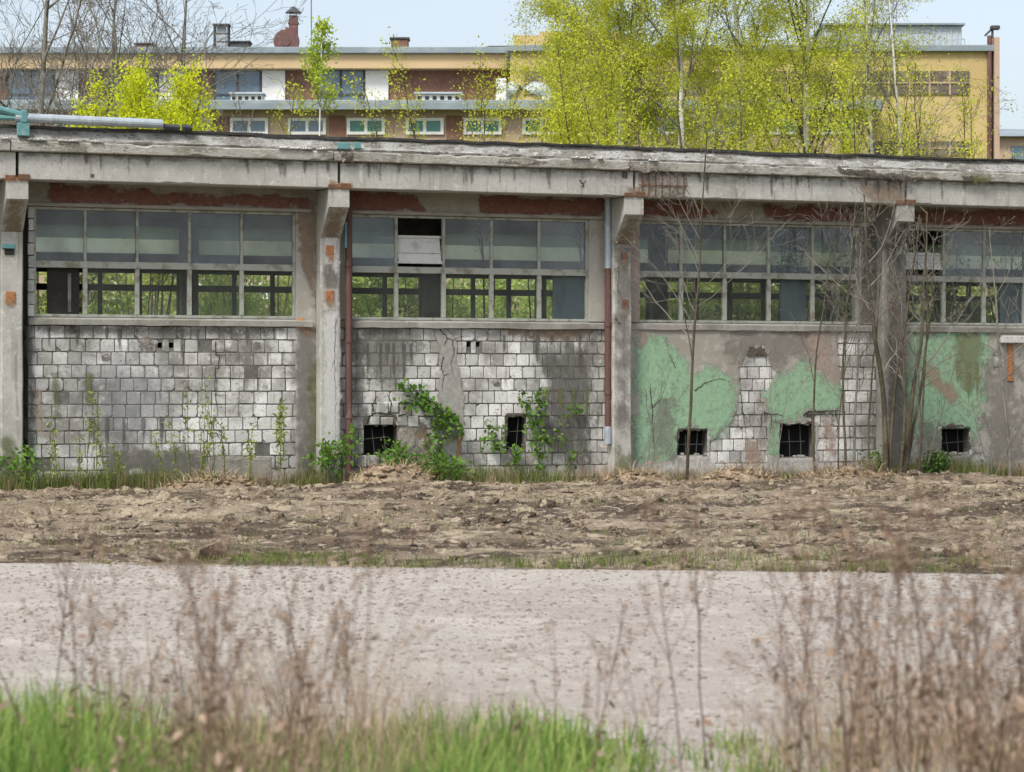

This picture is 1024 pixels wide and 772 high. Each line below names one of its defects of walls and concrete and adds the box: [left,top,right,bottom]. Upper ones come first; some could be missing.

peeling [48,174,310,209]
peeling [352,191,426,212]
peeling [478,195,604,216]
spalling [622,159,719,218]
peeling [762,203,858,222]
peeling [913,209,1024,226]
crack [435,328,469,388]
peeling [631,329,842,473]